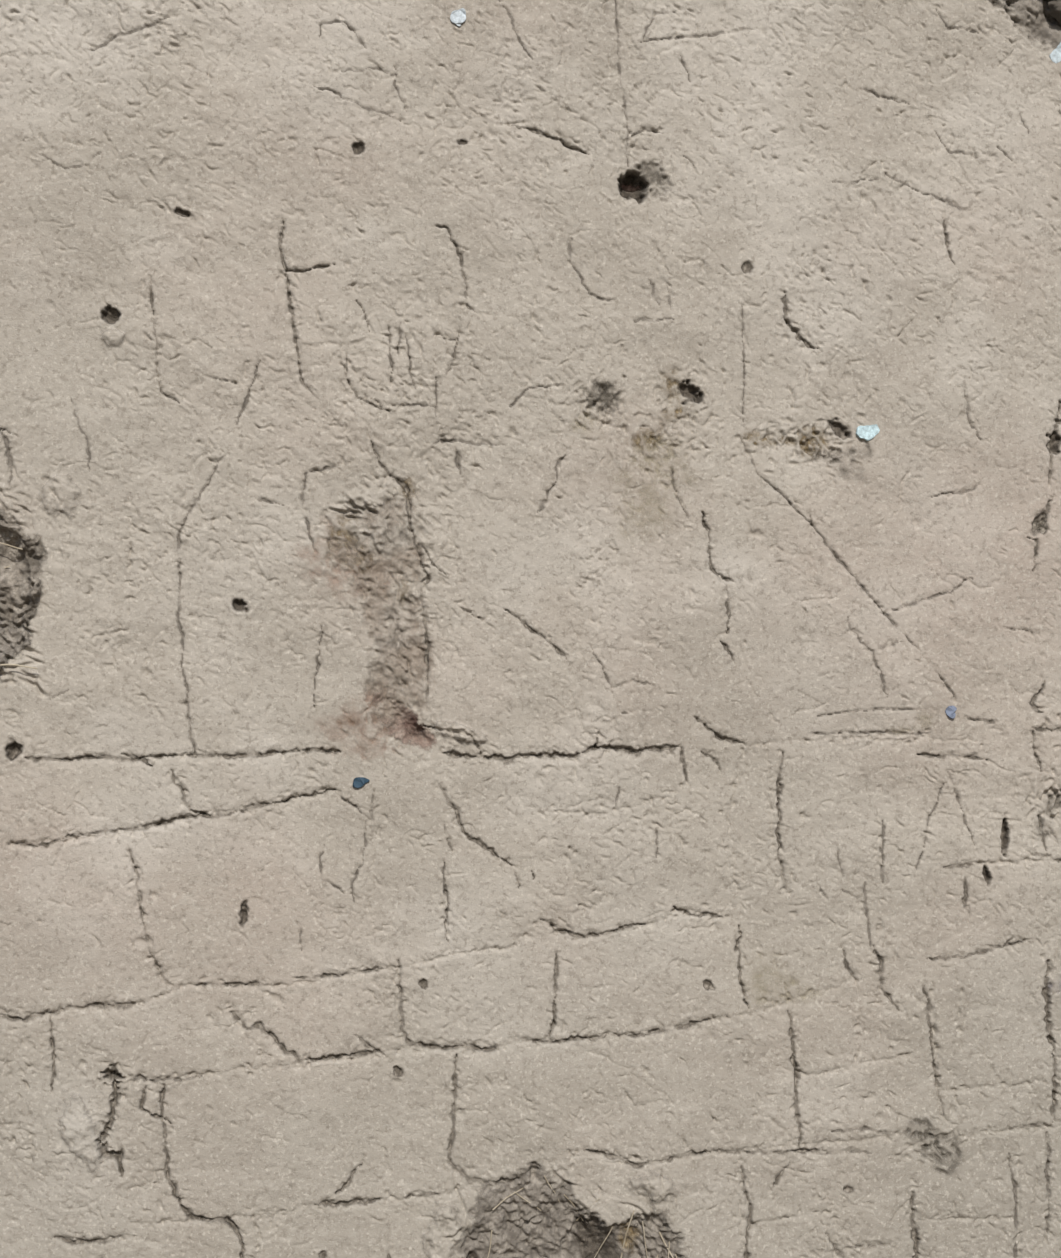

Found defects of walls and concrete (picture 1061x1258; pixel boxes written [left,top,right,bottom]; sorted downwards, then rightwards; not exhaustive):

spalling [0,509,44,669]
crack [15,608,367,972]
crack [442,803,535,940]
crack [424,718,743,781]
crack [134,1075,244,1258]
crack [235,1016,377,1062]
crack [296,949,496,1173]
spalling [460,1162,682,1258]
crack [532,919,708,1043]
crack [584,1011,880,1258]
crack [820,821,1025,1114]
crack [1008,965,1058,1258]